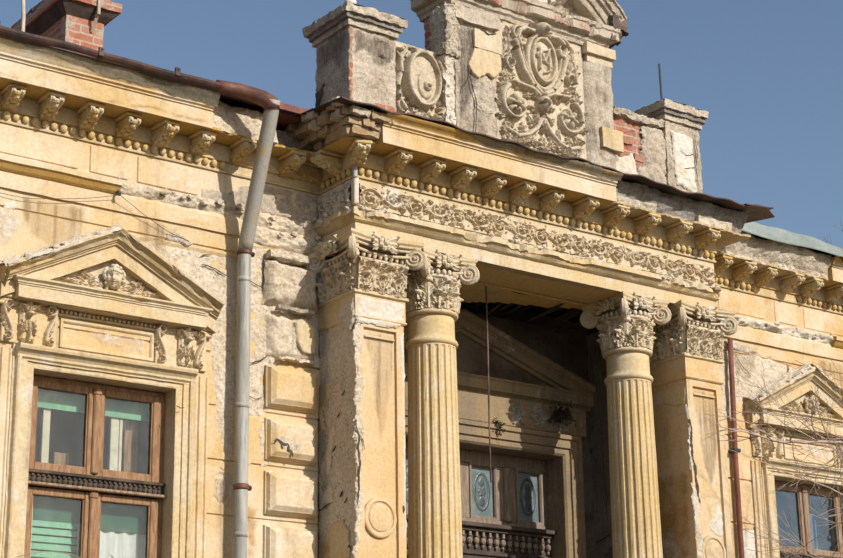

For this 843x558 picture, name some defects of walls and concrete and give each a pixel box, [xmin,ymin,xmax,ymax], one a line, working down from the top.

spalling [201,186,249,214]
spalling [259,185,329,247]
spalling [248,248,319,474]
spalling [721,343,832,418]
spalling [318,296,407,558]
flaking render [652,387,694,471]
flaking render [691,483,723,558]